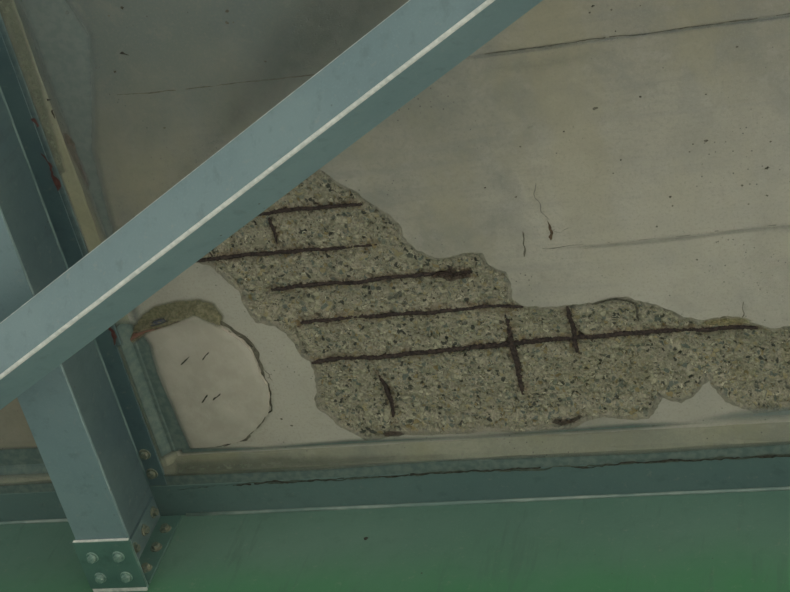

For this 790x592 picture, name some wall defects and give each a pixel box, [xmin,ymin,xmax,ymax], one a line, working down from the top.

crack [486,13,790,54]
crack [523,185,583,257]
corrosion [431,266,471,282]
spalling [196,169,790,440]
crack [179,454,790,490]